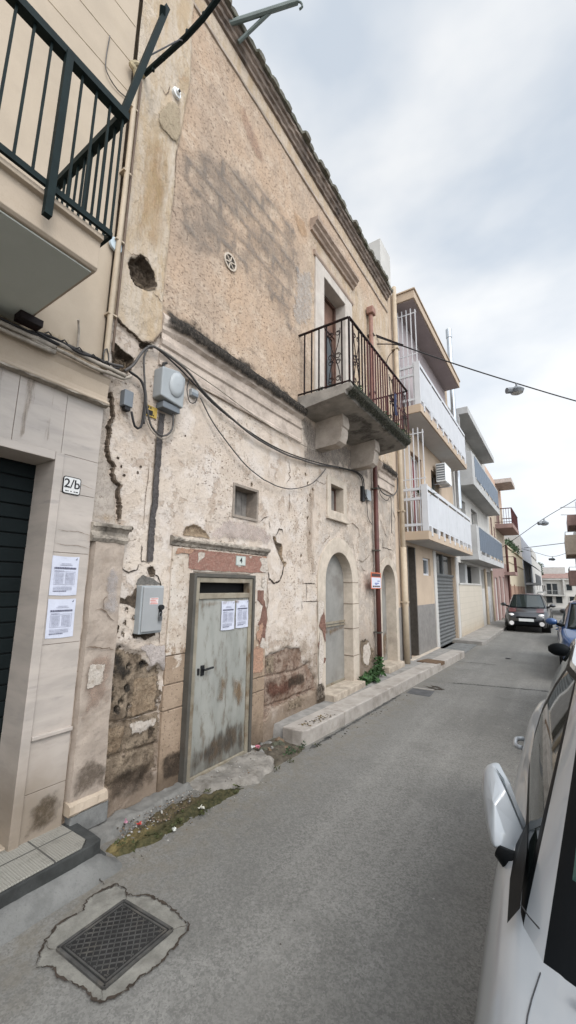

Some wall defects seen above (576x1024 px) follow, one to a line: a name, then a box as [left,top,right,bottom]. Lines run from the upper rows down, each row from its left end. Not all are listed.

spalling [127,250,157,290]
damp [186,155,312,329]
damp [168,311,368,477]
spalling [87,588,165,789]
damp [78,752,180,797]
spalling [176,524,326,723]